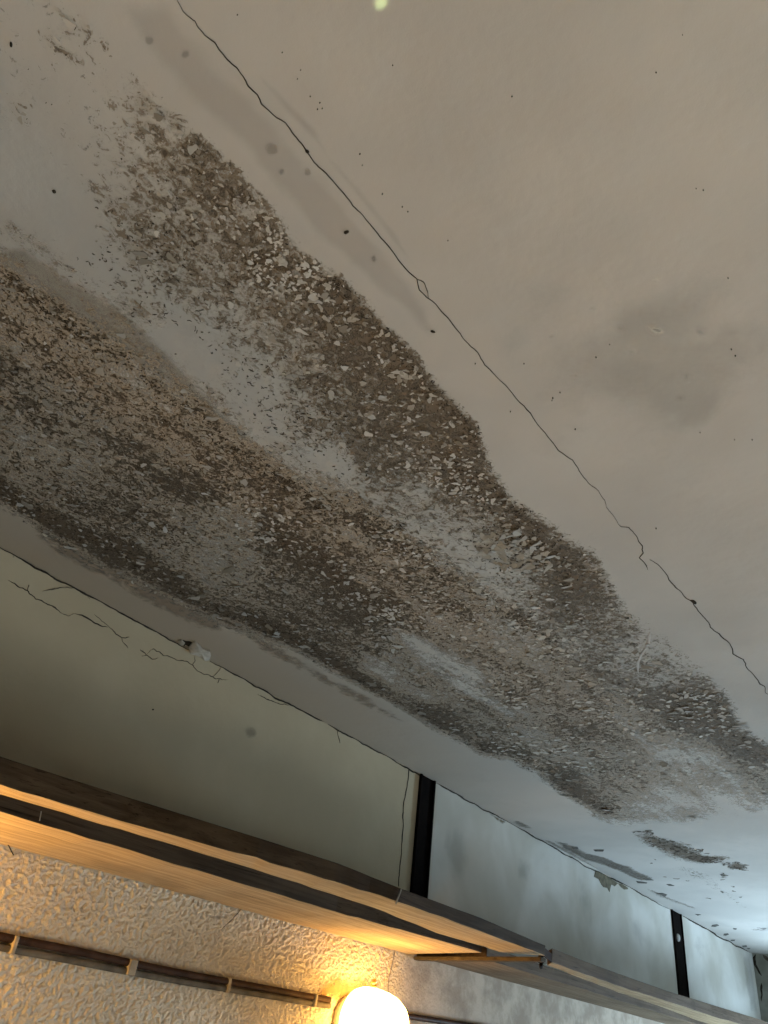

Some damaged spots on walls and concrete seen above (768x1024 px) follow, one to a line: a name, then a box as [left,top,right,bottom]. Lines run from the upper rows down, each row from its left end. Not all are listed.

peeling [38,14,112,75]
peeling [0,90,768,903]
crack [177,0,767,694]
crack [0,547,768,1002]
peeling [548,841,701,916]